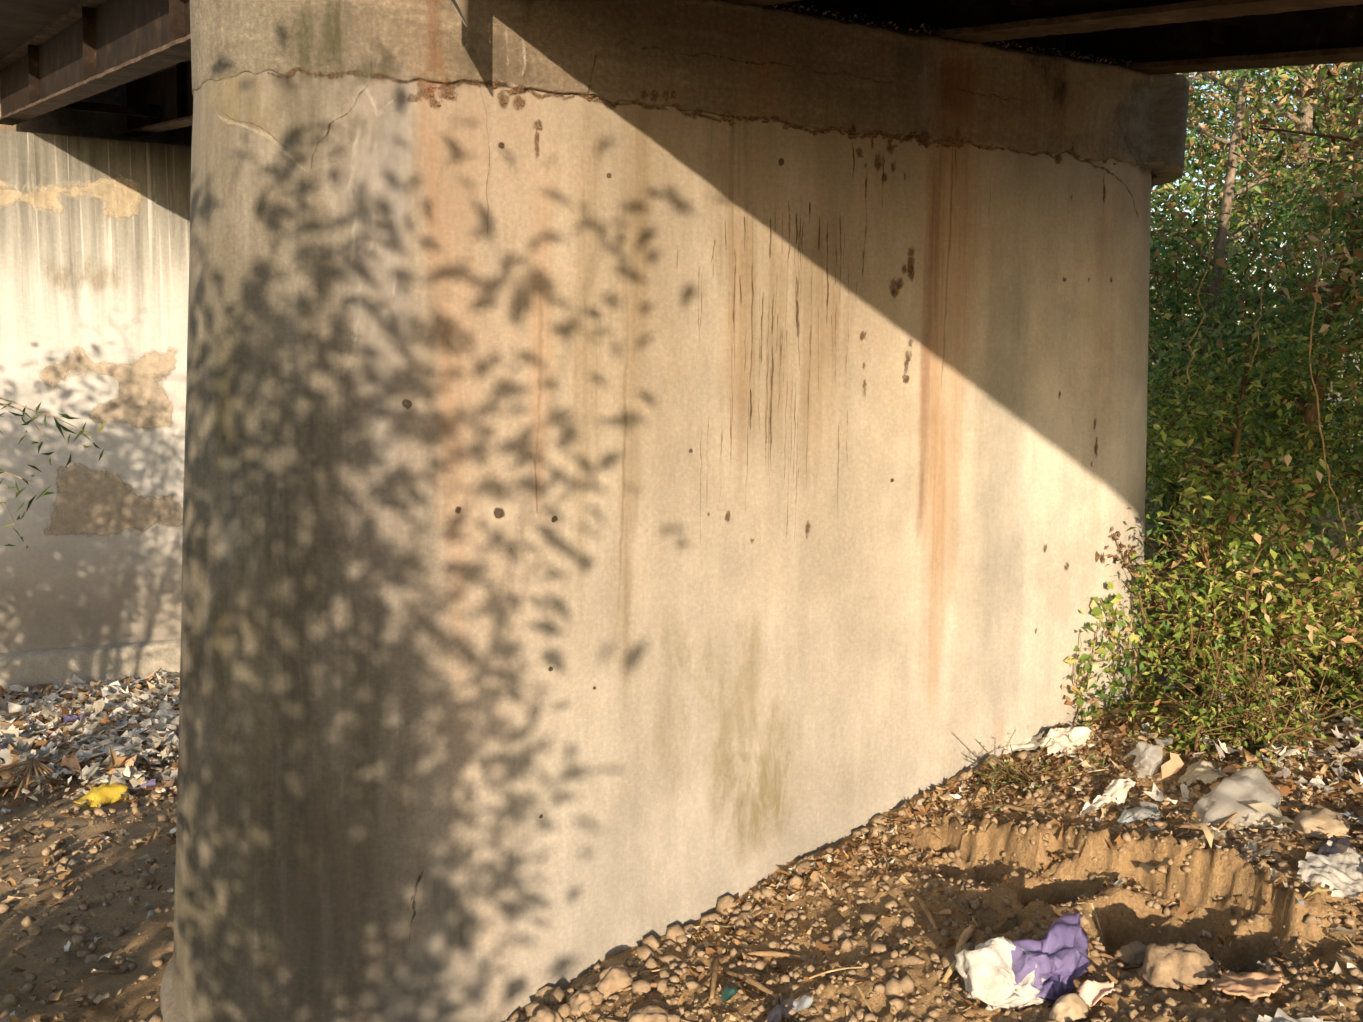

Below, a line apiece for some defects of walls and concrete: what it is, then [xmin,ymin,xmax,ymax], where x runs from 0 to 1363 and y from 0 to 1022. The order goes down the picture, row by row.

crack [267,68,408,167]
crack [449,55,1139,218]
peeling [0,177,141,218]
leakage [769,201,841,257]
peeling [40,347,176,429]
leakage [733,270,796,465]
peeling [44,464,183,535]